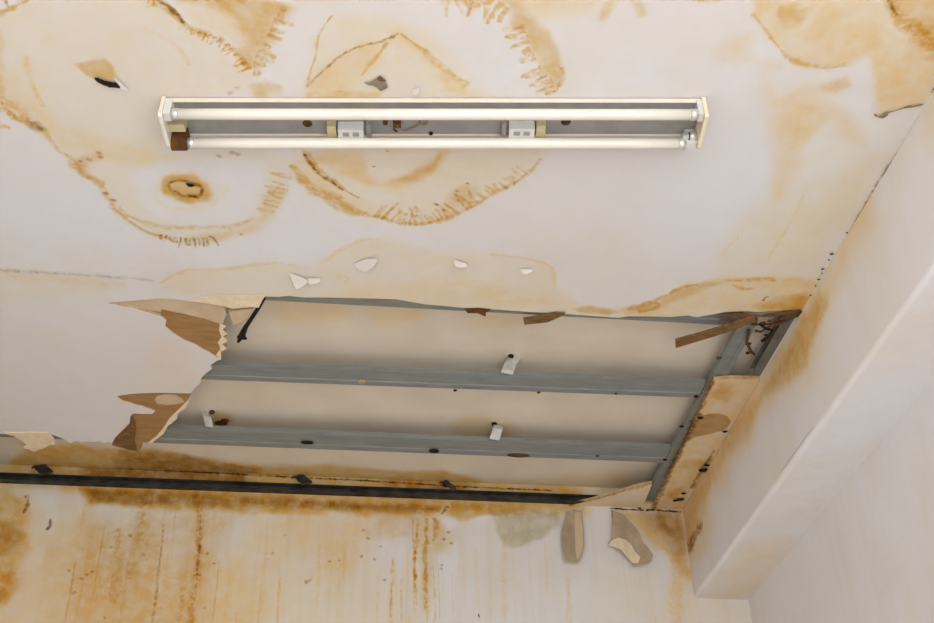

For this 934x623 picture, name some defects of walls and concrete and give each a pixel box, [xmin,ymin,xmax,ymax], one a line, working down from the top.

peeling [94,77,130,92]
peeling [289,273,321,289]
damp [717,309,802,336]